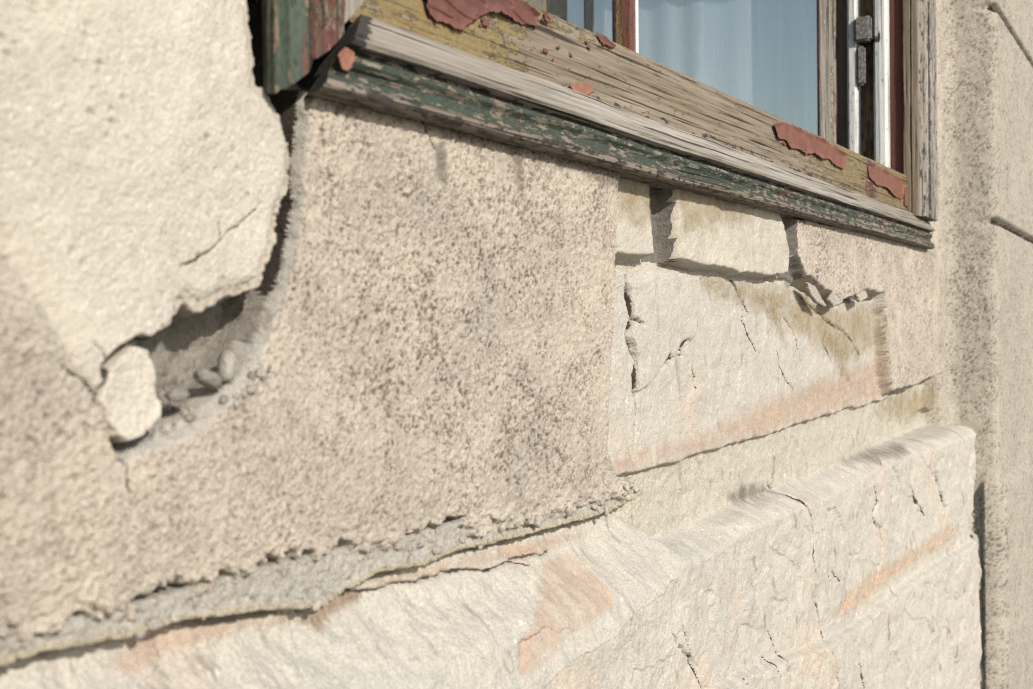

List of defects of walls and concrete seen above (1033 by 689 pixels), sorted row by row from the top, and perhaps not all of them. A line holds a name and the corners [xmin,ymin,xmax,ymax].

peeling [426,0,551,31]
peeling [338,47,355,71]
peeling [774,122,847,169]
peeling [862,166,909,208]
spalling [96,91,314,464]
crack [612,285,639,389]
crack [730,280,860,389]
crack [62,341,108,412]
crack [665,340,696,388]
crack [910,476,945,518]
spalling [0,473,643,667]
crack [344,550,548,593]